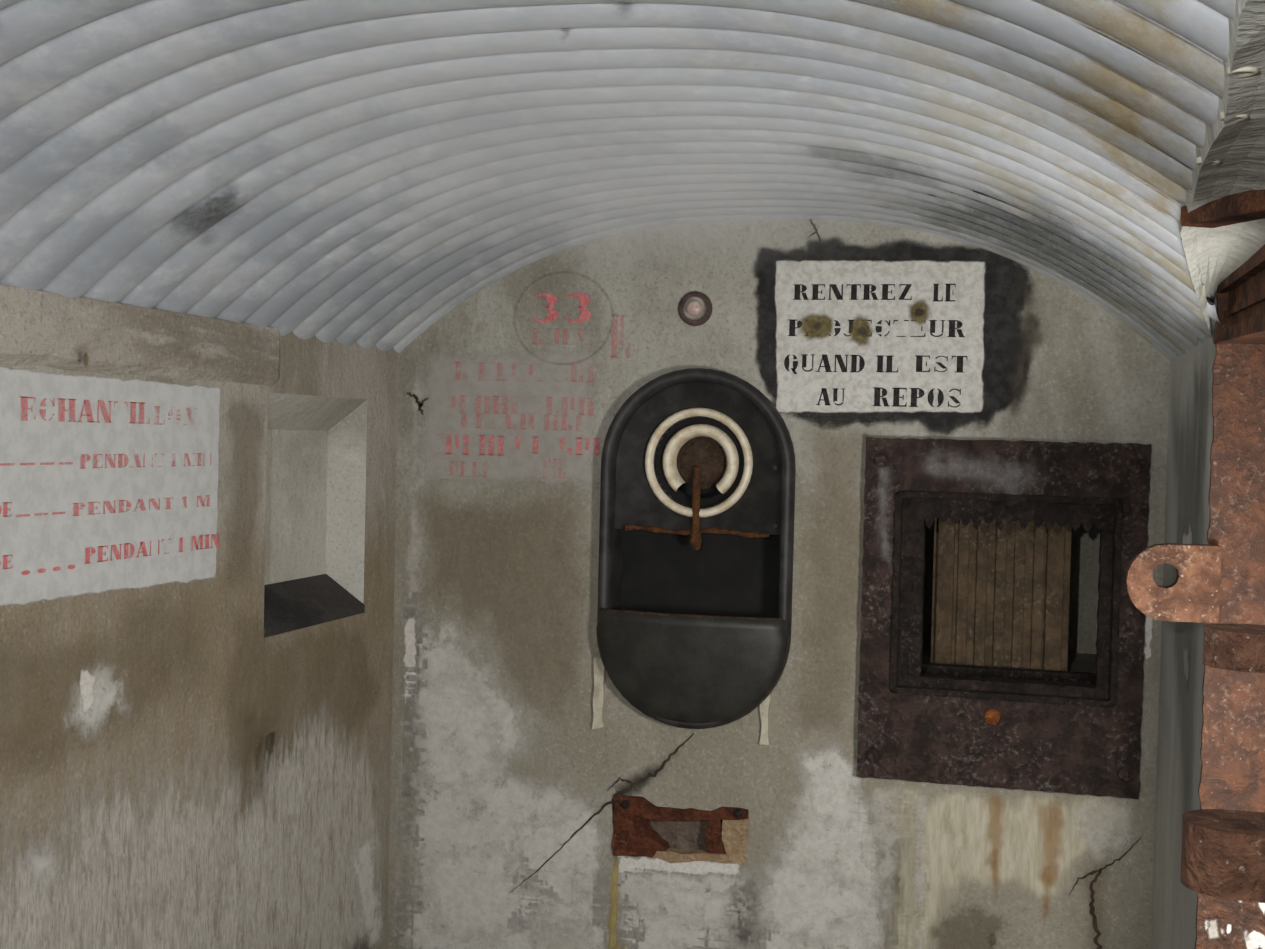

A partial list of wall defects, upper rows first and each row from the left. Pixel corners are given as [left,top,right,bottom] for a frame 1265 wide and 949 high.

leakage [943,214,1139,304]
leakage [71,668,123,732]
leakage [0,716,382,949]
crack [511,733,694,892]
leakage [398,623,1133,949]
crack [1069,838,1141,949]